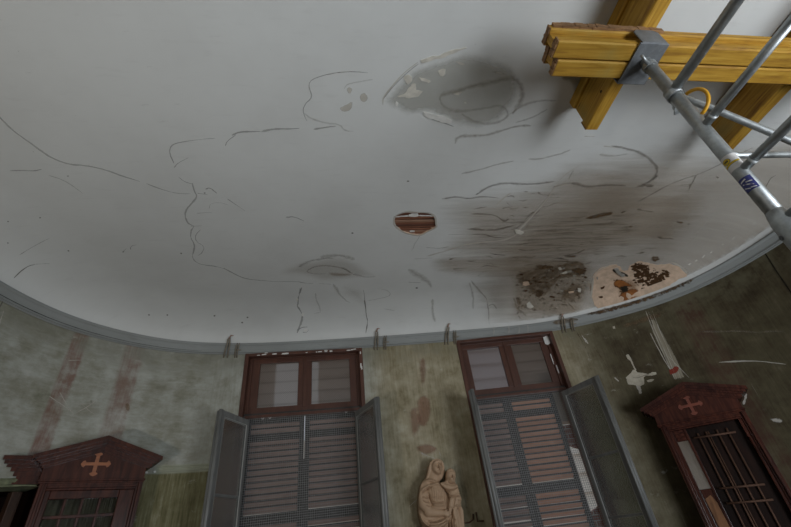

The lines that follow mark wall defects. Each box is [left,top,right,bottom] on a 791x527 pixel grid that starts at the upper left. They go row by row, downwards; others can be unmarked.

crack [0,118,321,284]
spalling [393,211,437,248]
damp [511,243,594,310]
flaking render [590,256,689,308]
damp [589,280,692,315]
flaking render [615,354,656,394]